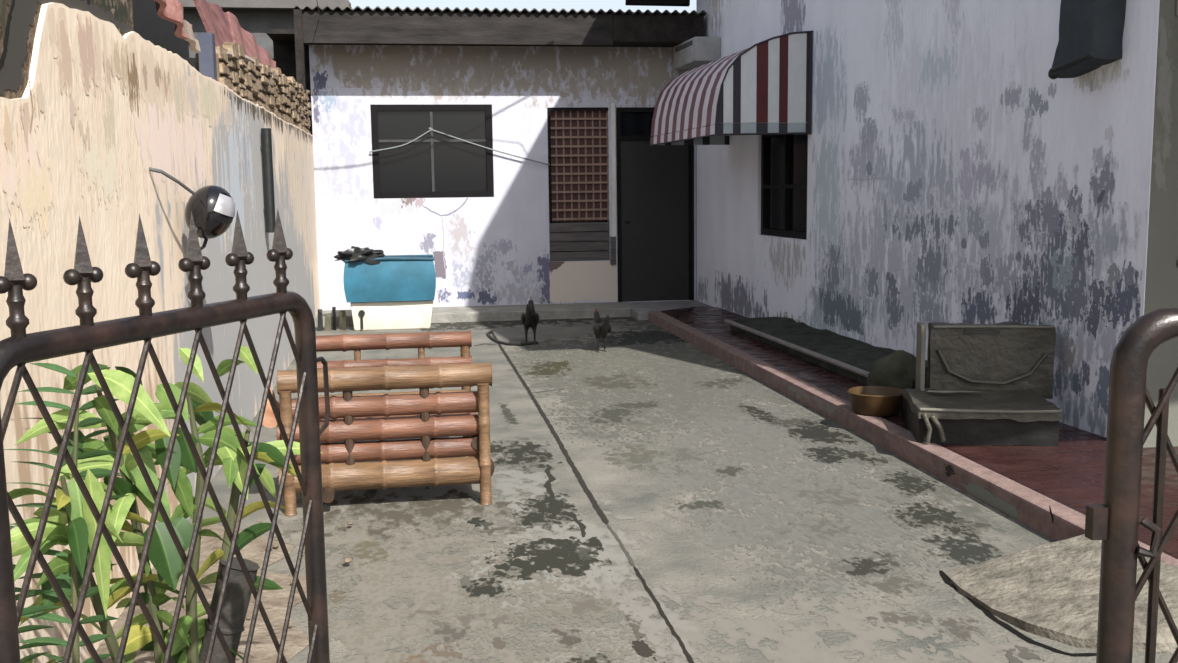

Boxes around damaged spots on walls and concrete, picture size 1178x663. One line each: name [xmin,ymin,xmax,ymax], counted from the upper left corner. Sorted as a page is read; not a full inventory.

spalling [433,251,447,279]
water stain [419,210,587,305]
spalling [776,380,842,421]
water stain [323,317,1079,663]
water stain [272,498,306,572]